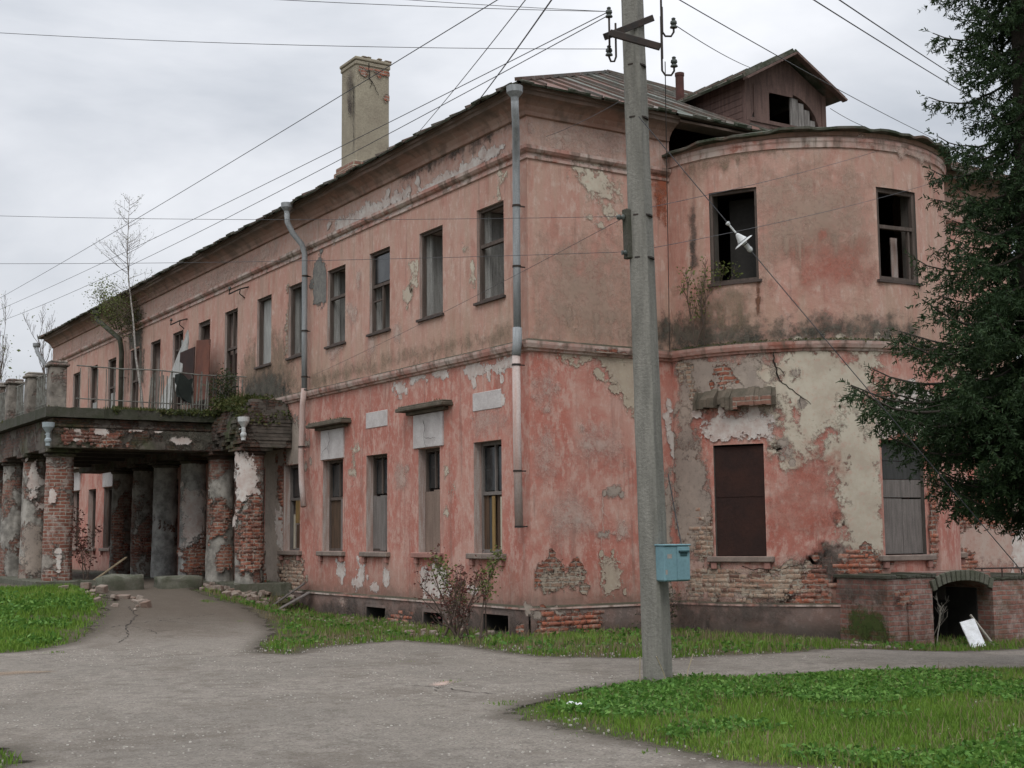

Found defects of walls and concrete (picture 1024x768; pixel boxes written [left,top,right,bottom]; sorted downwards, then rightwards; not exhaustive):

peeling [309,144,505,310]
peeling [566,161,623,229]
water stain [657,291,919,356]
peeling [556,353,634,417]
crack [772,352,811,405]
peeling [25,458,57,510]
spalling [61,428,192,448]
peeling [662,332,935,604]
peeling [19,523,62,579]
spalling [110,508,152,571]
peeling [335,556,390,593]
spalling [515,520,629,636]